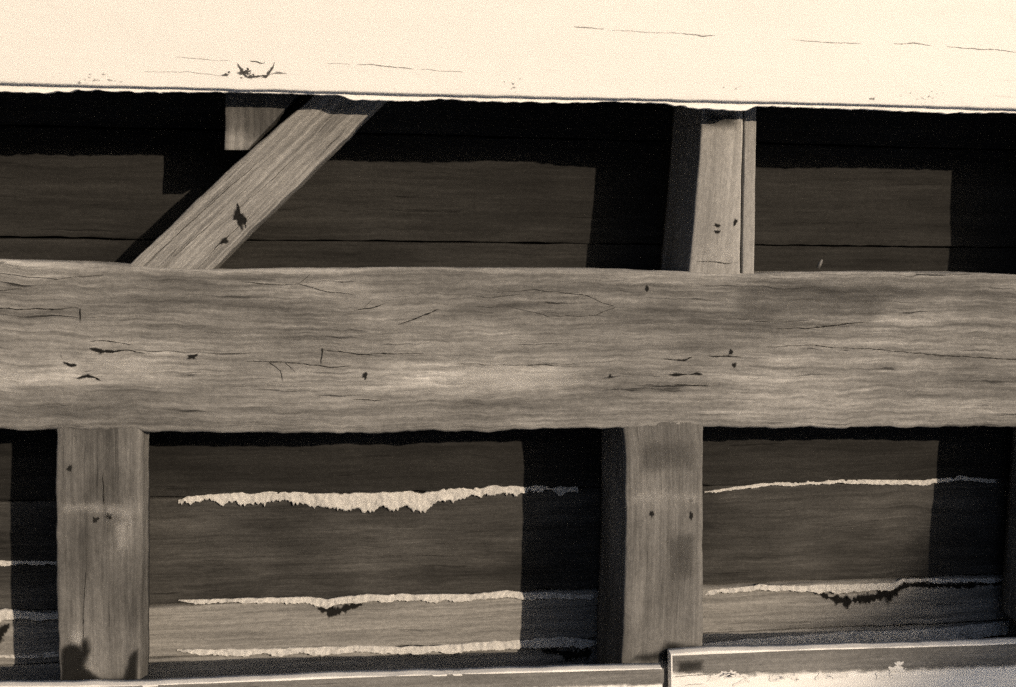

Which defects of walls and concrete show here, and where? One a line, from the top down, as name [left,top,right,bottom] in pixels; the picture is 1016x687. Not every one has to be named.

crack [894,42,1011,52]
peeling [222,61,287,78]
spalling [820,581,1002,609]
spalling [318,603,362,617]
spalling [542,648,591,661]